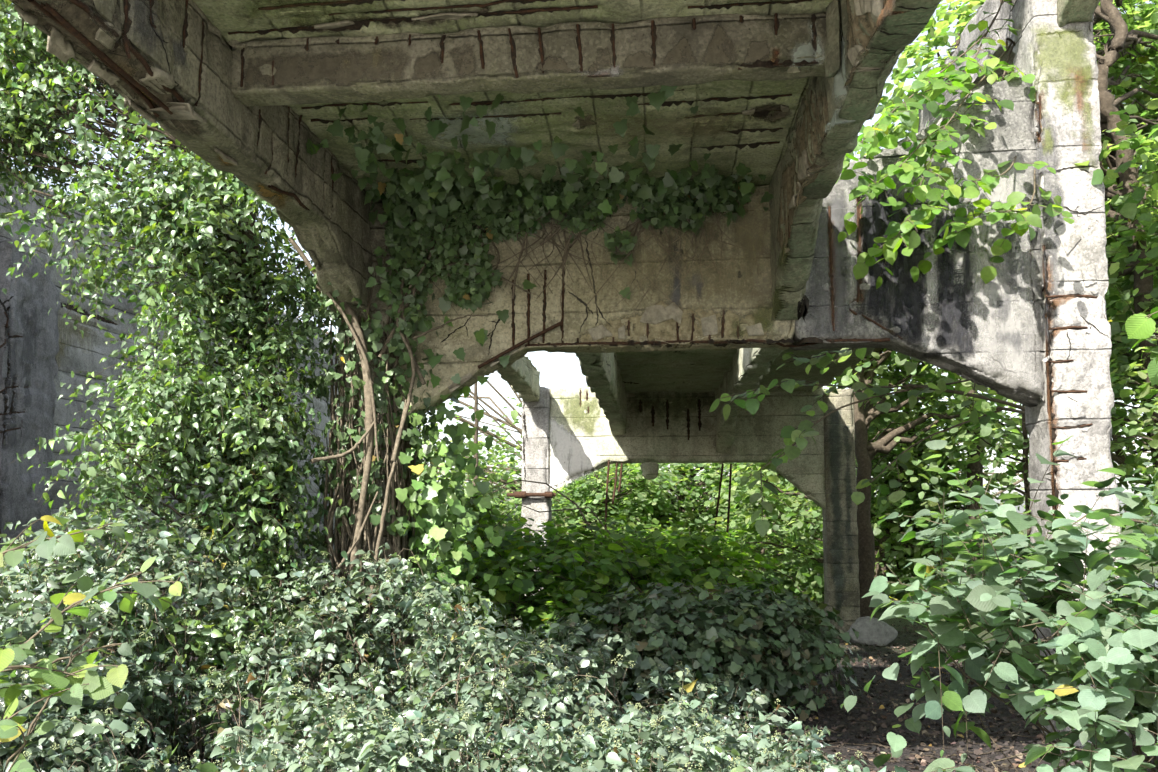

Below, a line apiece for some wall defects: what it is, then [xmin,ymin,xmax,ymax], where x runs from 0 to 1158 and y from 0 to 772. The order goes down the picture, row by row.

spalling [0,0,207,135]
spalling [252,101,428,211]
peeling [228,0,818,90]
spalling [410,89,829,263]
spalling [844,0,895,87]
corrosion [1074,71,1086,110]
damp [811,107,1064,387]
corrosion [1043,263,1075,491]